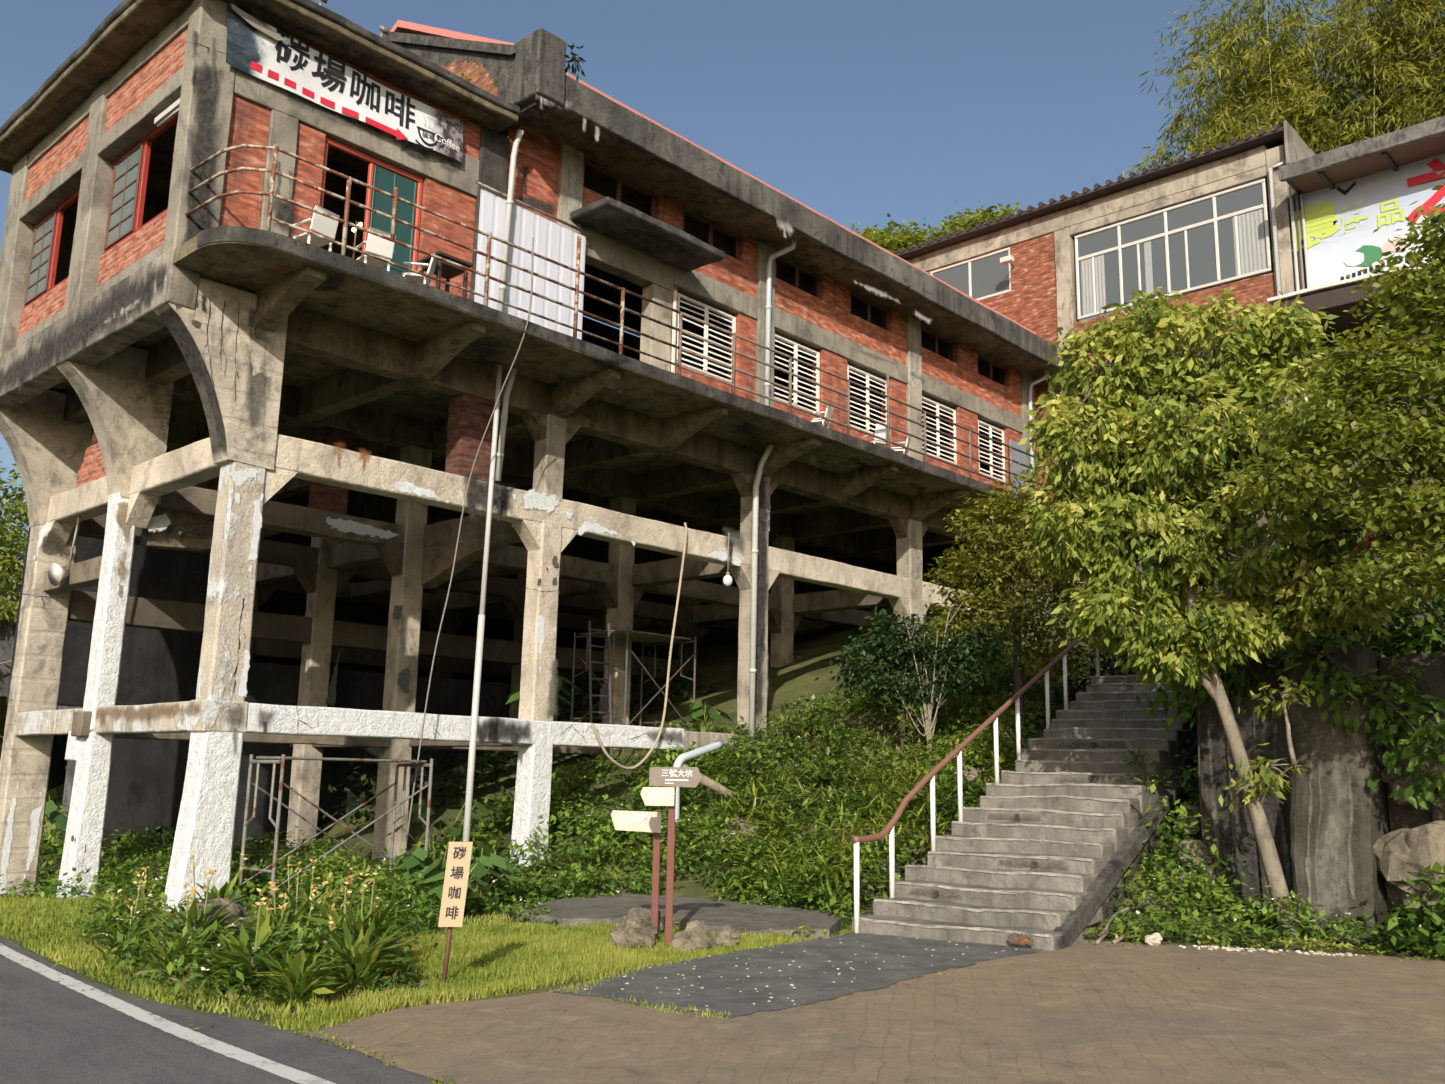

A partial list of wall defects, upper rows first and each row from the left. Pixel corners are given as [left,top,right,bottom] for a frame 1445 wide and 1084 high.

water stain [185,31,221,242]
peeling [228,467,264,573]
peeling [326,517,399,539]
peeling [392,482,449,503]
peeling [513,489,636,546]
peeling [238,636,250,697]
water stain [230,707,242,753]
water stain [260,712,272,733]